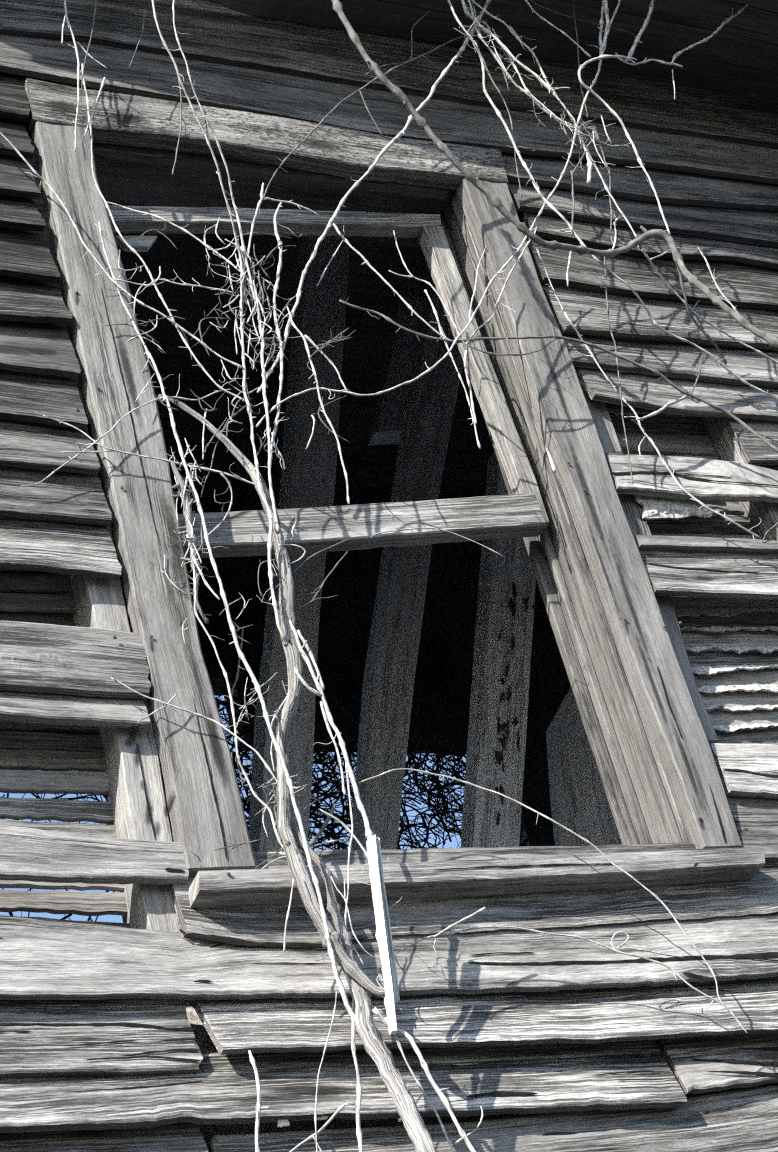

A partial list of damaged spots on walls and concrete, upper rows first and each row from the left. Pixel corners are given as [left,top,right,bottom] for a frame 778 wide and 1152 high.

crack [468,952,778,993]